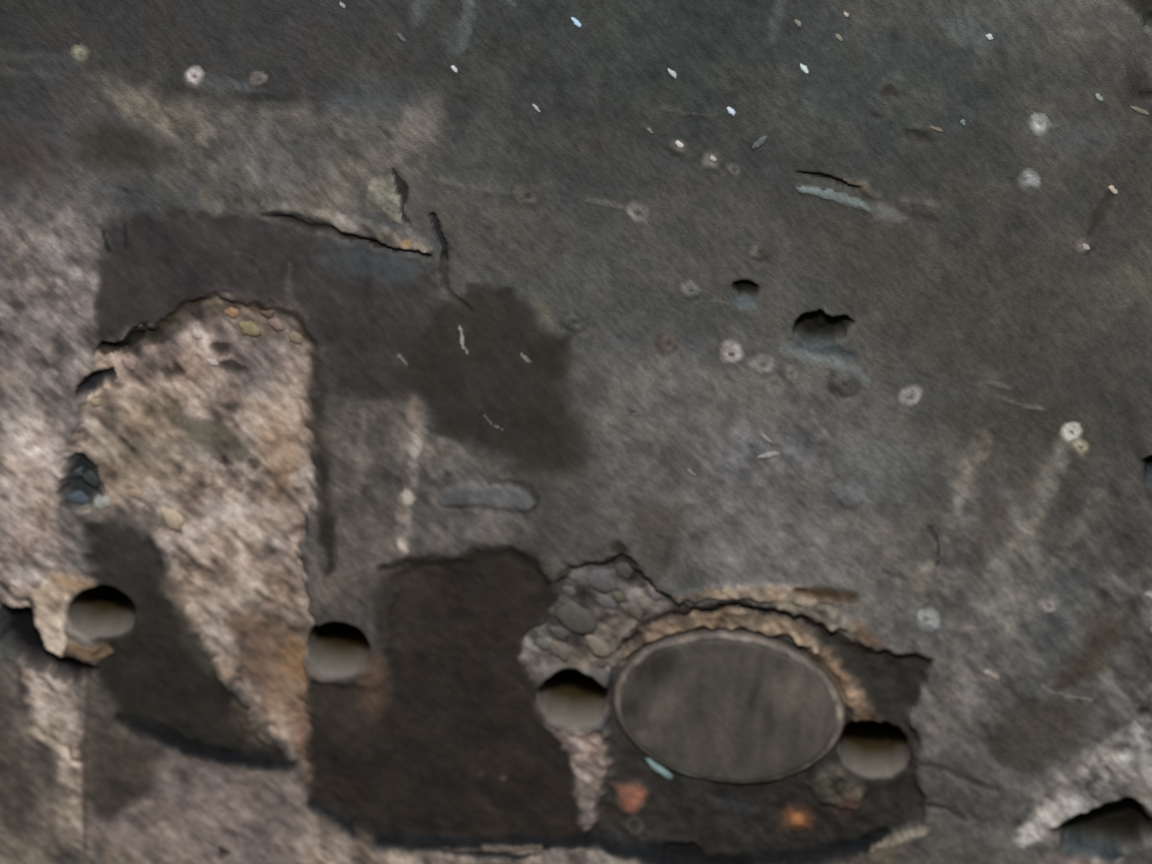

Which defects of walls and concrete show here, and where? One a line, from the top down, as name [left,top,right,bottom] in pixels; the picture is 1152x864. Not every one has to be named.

crack [377,125,394,140]
crack [260,168,472,312]
leakage [393,280,599,550]
spalling [0,207,935,864]
leakage [1140,586,1152,634]
leakage [1009,685,1152,853]
spalling [1052,797,1152,864]